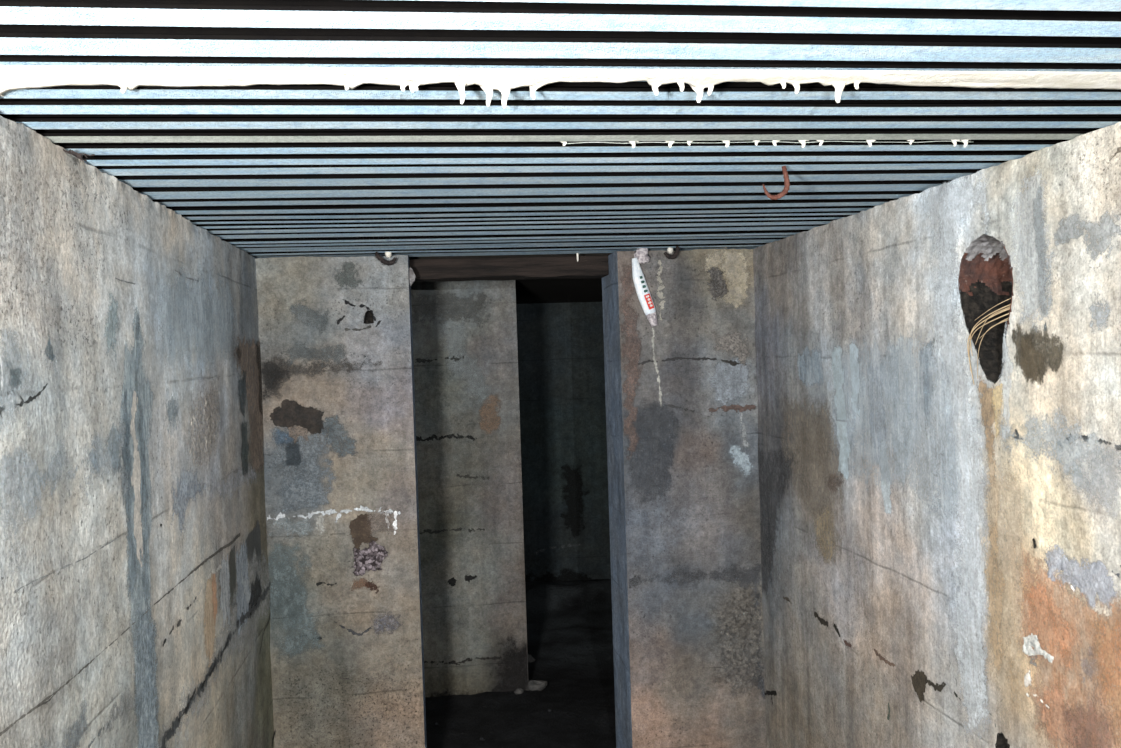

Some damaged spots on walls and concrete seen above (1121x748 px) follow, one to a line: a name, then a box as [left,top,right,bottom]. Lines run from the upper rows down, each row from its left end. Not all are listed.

leakage [0,65,1121,109]
leakage [1011,172,1052,326]
crack [0,377,51,418]
crack [0,533,240,736]
leakage [0,294,400,748]
crack [161,582,271,748]
spalling [352,540,388,576]
leakage [624,260,678,502]
leakage [797,177,989,738]
rust [978,376,1121,748]
leakage [1000,324,1121,512]
crack [1057,434,1121,451]